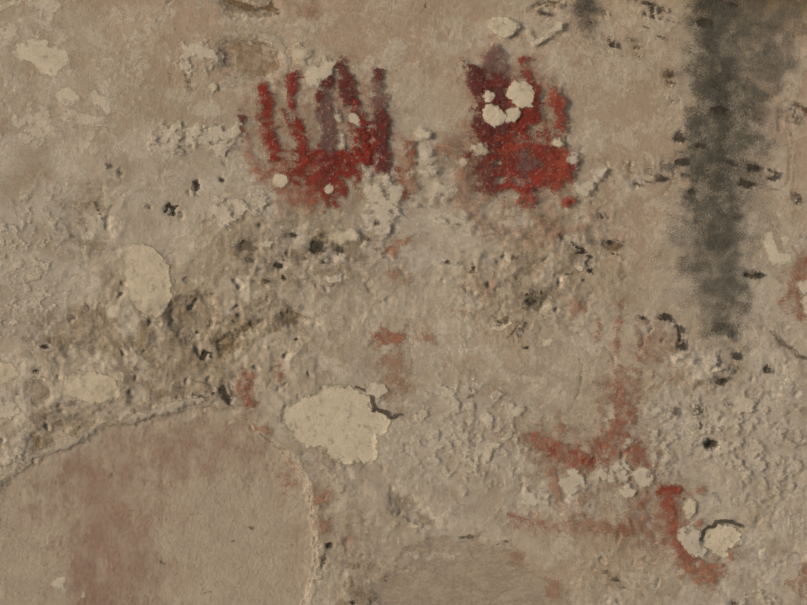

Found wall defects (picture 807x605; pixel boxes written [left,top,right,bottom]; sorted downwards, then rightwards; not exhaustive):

spalling [209,0,292,92]
damp [530,0,606,39]
damp [629,0,807,341]
damp [645,313,686,361]
damp [715,352,739,386]
spalling [0,292,324,605]
peeling [279,381,403,465]